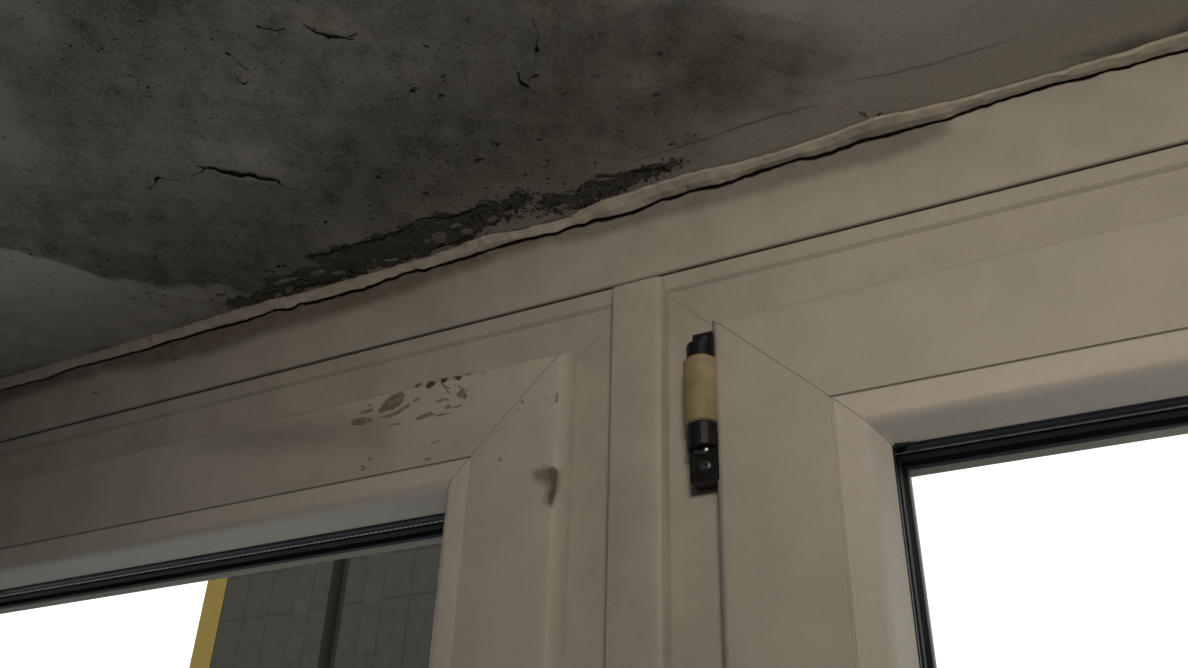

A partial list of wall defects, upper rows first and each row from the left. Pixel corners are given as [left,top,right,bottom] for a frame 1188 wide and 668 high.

crack [257,25,358,40]
water stain [0,0,817,361]
flaking render [222,158,685,309]
crack [1,49,1188,391]
water stain [548,467,558,504]